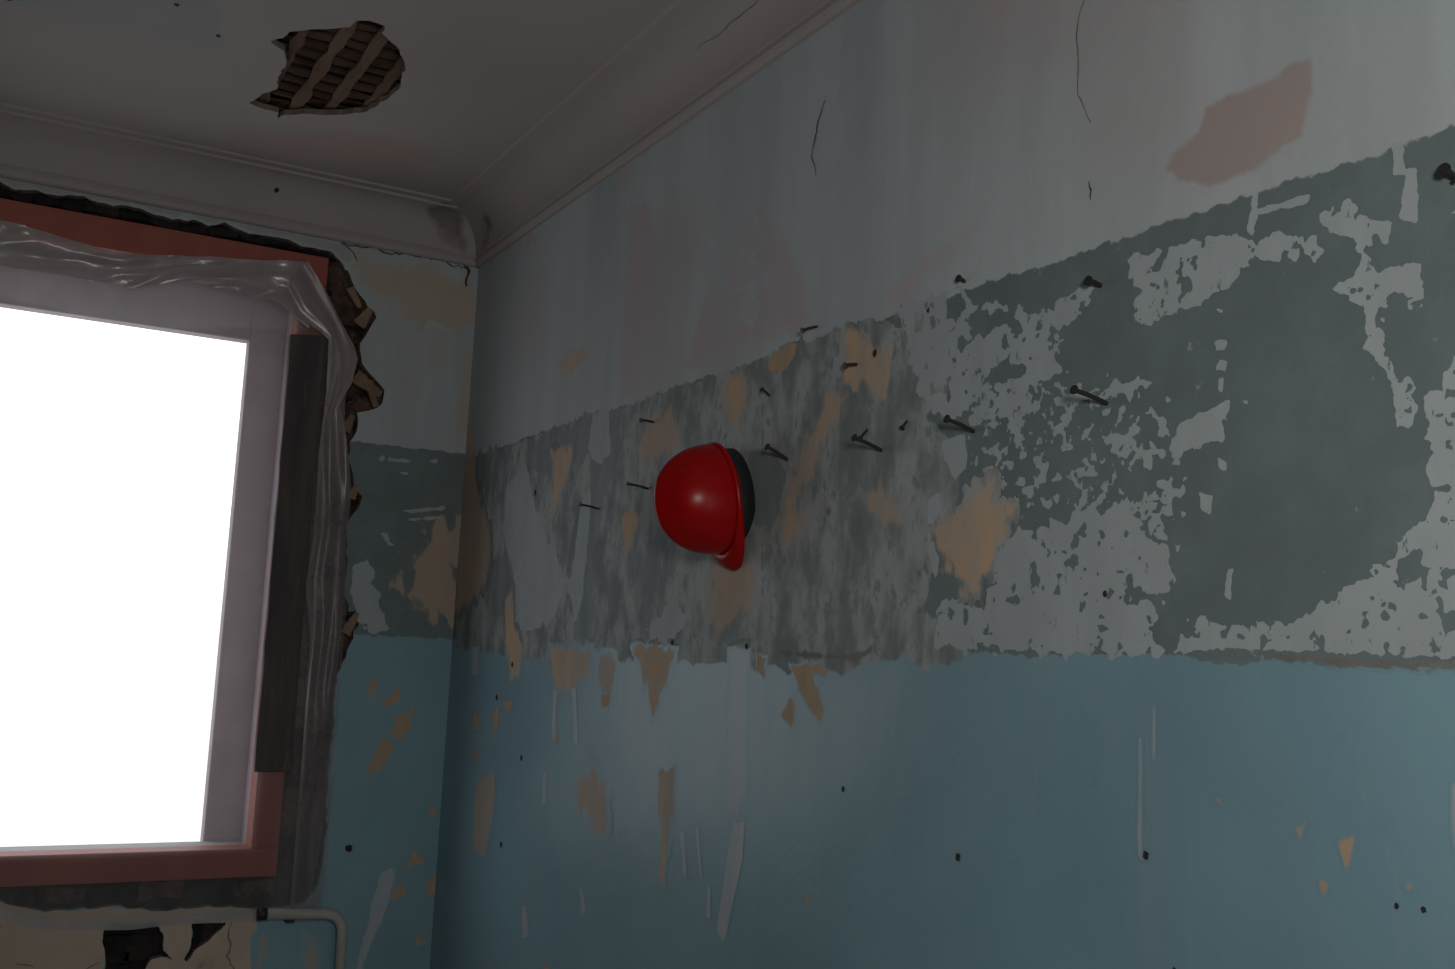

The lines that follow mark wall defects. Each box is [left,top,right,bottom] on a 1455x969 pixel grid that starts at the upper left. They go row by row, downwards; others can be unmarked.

flaking render [255,21,405,113]
crack [1076,0,1091,122]
flaking render [1159,53,1318,193]
peeling [1128,193,1324,326]
peeling [1173,142,1455,660]
peeling [0,177,1230,944]
flaking render [102,923,223,969]
peeling [355,848,436,969]